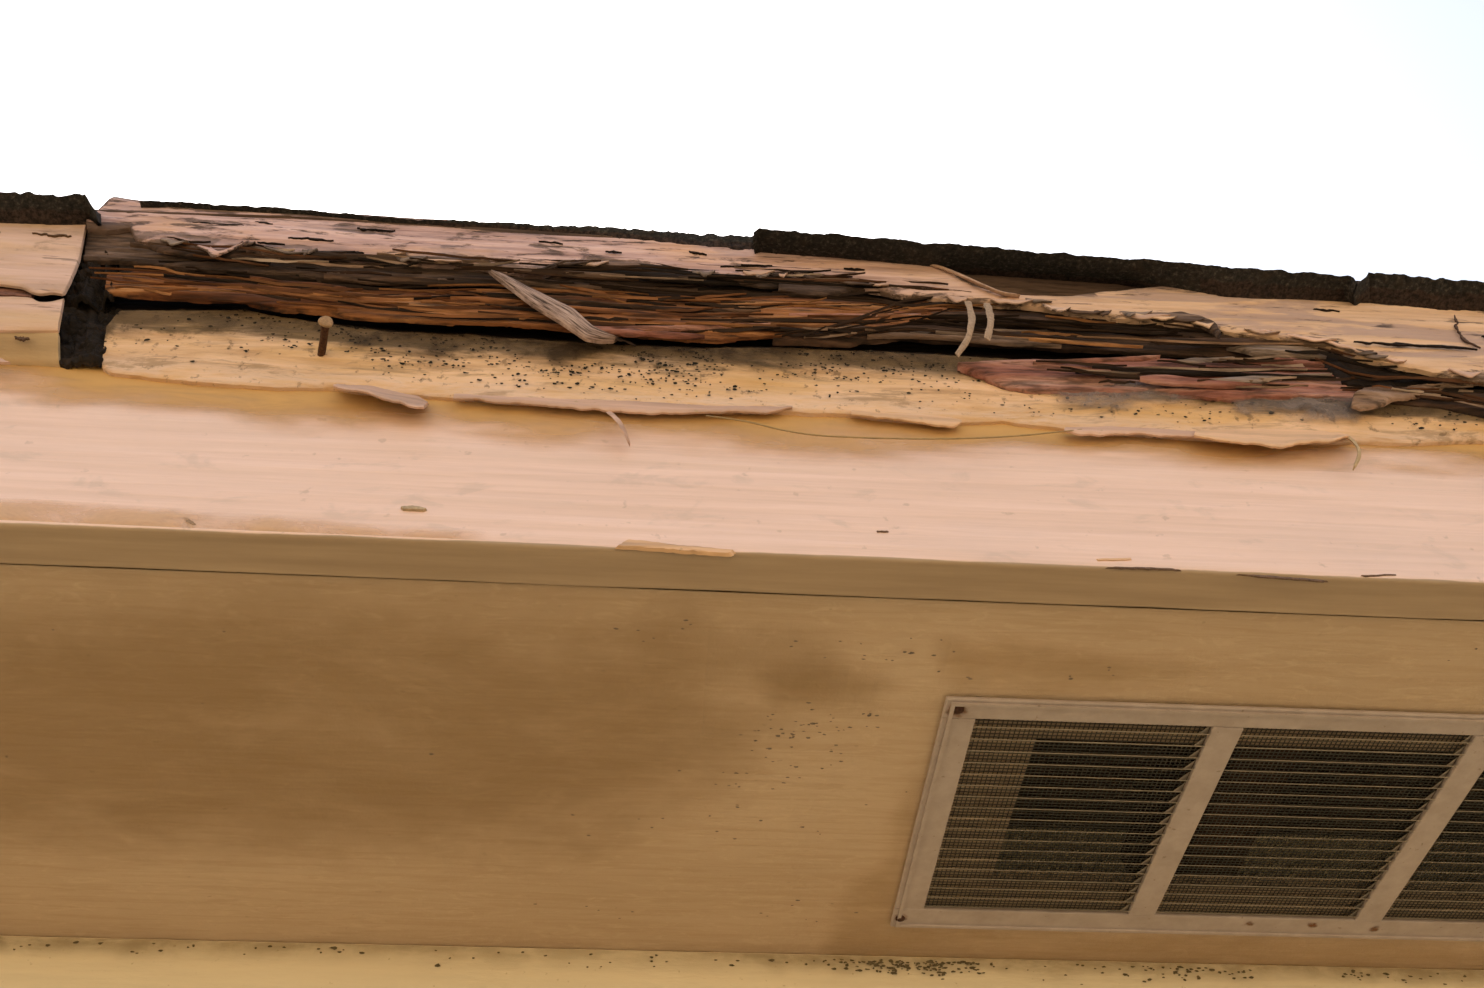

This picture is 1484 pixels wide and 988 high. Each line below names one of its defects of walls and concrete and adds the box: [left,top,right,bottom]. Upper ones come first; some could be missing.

peeling [160,238,354,258]
peeling [930,264,1214,329]
leakage [0,309,1484,459]
peeling [957,359,1355,403]
peeling [333,383,429,409]
peeling [453,394,792,415]
peeling [851,410,962,428]
peeling [1064,426,1350,449]
leakage [741,702,879,789]
leakage [769,959,1008,980]
leakage [1064,964,1254,985]
leakage [1342,970,1467,985]